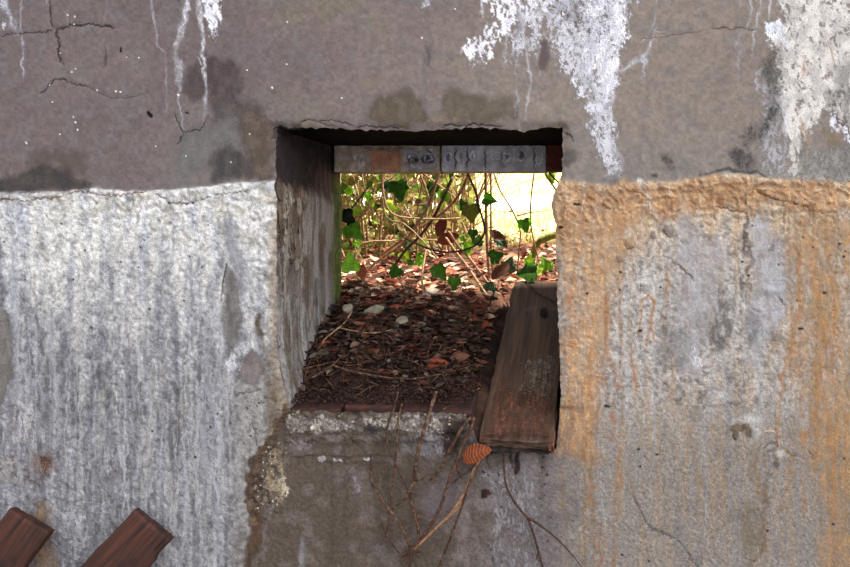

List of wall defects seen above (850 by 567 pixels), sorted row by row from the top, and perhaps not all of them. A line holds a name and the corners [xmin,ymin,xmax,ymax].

crack [1,4,114,93]
leakage [174,0,334,190]
leakage [462,0,651,184]
leakage [700,0,850,184]
leakage [0,153,87,192]
leakage [218,342,250,395]
corrosion [555,176,850,567]
leakage [0,395,38,484]
spalling [254,411,466,517]
leakage [58,507,89,562]
crack [632,495,696,565]